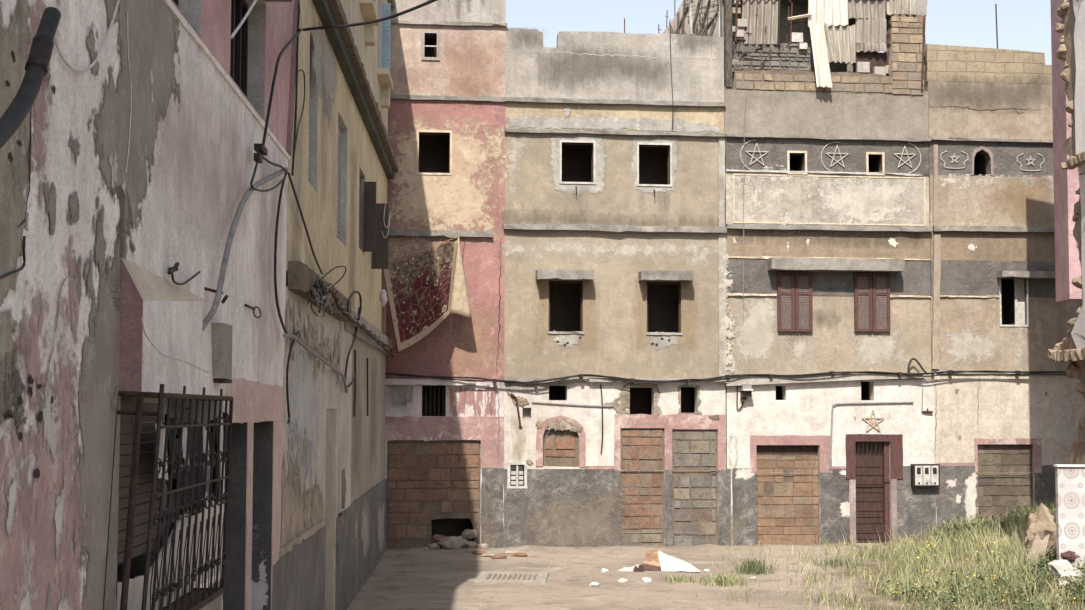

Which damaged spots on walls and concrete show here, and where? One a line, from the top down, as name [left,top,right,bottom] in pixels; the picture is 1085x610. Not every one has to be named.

spalling [1055,2,1075,151]
spalling [1072,187,1081,260]
peeling [0,0,181,610]
spalling [1053,306,1082,350]
flaking render [200,581,223,610]
peeling [251,560,269,610]